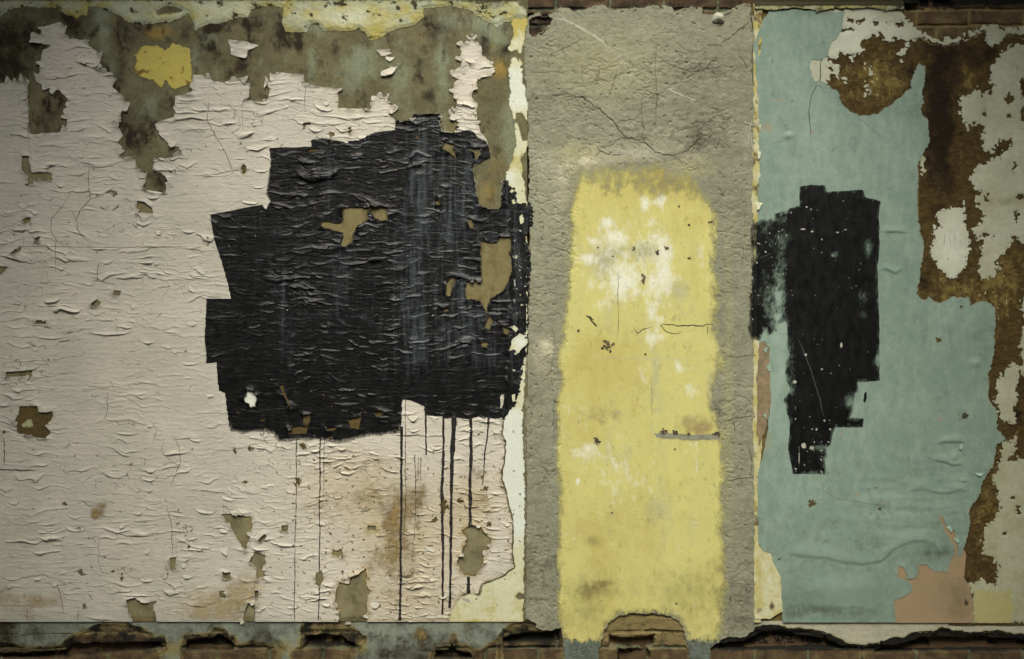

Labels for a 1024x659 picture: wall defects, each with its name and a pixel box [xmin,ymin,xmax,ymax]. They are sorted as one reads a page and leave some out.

crack [532,7,754,160]
peeling [0,0,754,247]
flaking render [826,0,1024,605]
peeling [0,365,53,439]
flaking render [0,495,380,659]
peeling [457,521,492,576]
flaking render [428,619,565,659]
flaking render [598,603,689,659]
flaking render [710,621,1024,659]